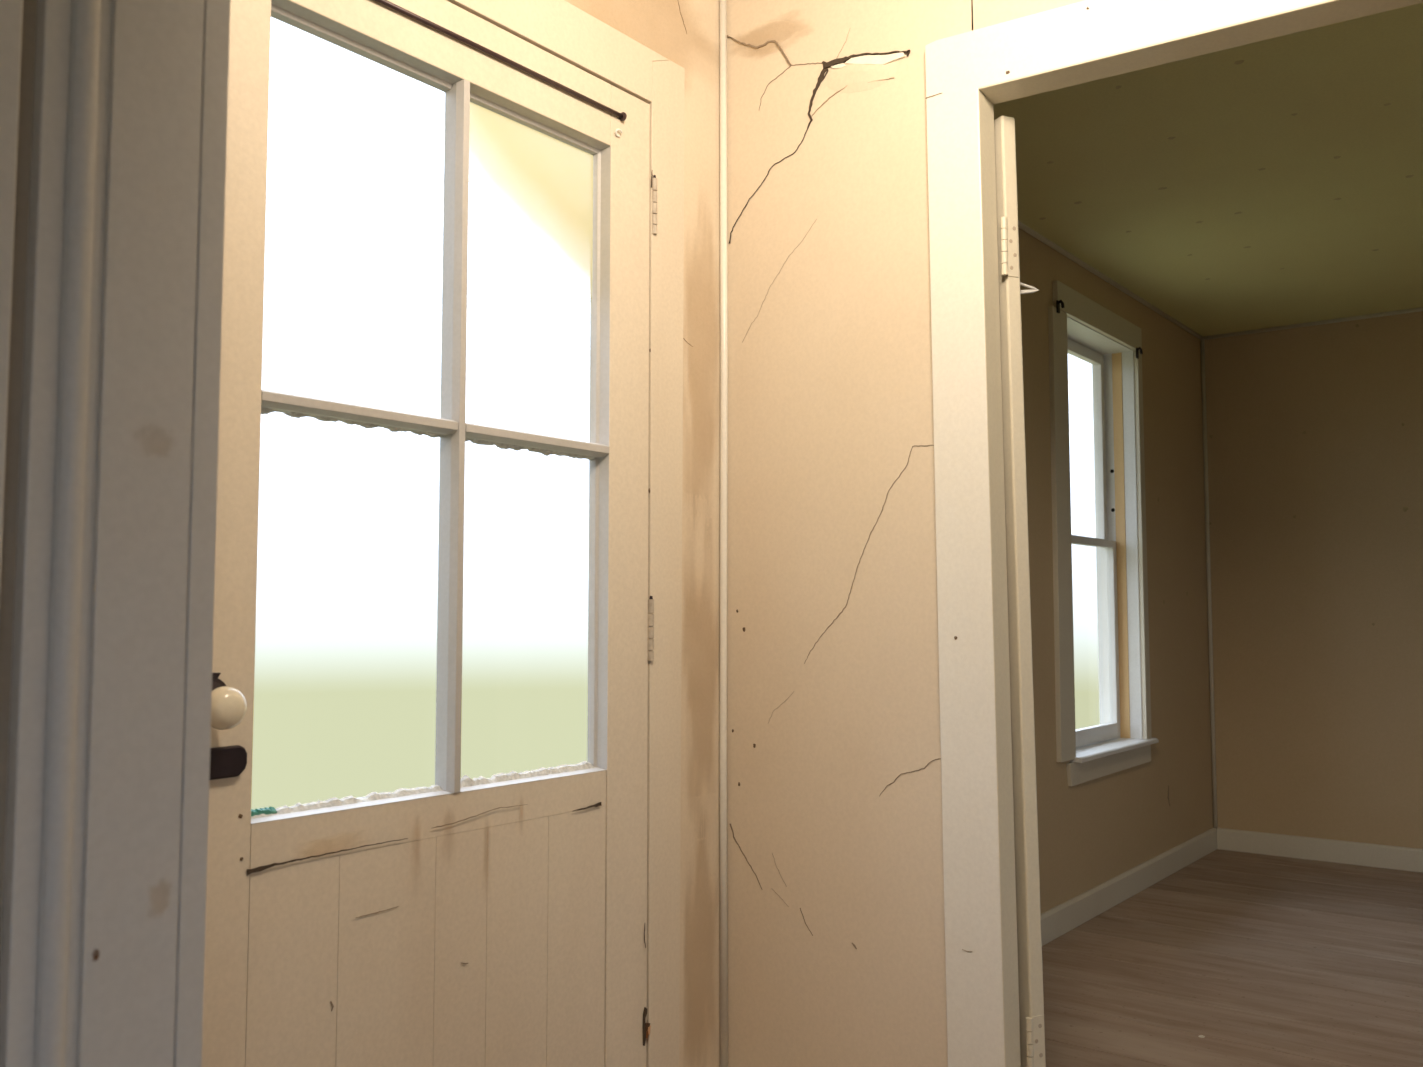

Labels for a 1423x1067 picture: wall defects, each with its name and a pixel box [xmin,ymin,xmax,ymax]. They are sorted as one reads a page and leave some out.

crack [727,29,911,244]
crack [768,445,934,723]
crack [730,824,813,936]